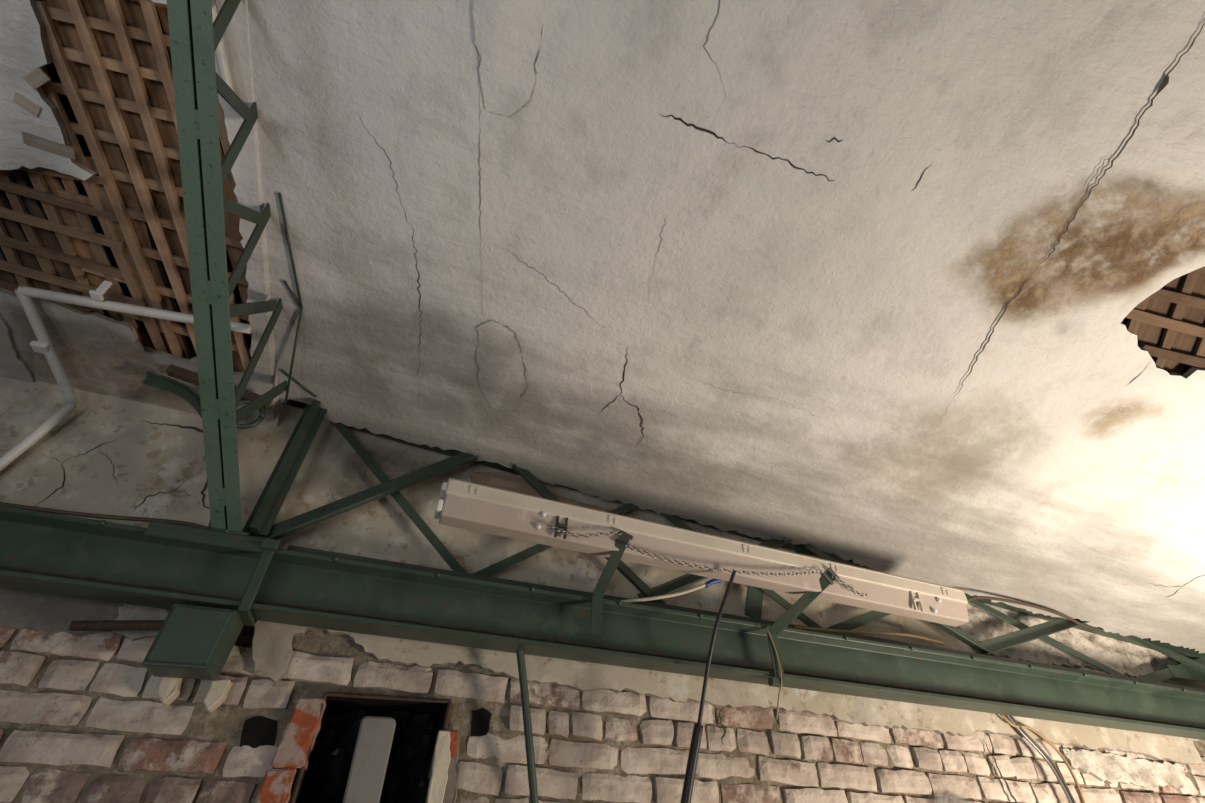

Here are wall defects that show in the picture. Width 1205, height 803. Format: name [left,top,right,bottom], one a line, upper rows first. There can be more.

flaking render [0,0,196,359]
flaking render [217,93,252,372]
crack [476,47,644,446]
crack [658,0,834,181]
crack [934,20,1205,429]
water stain [976,187,1205,316]
flaking render [1121,266,1205,376]
crack [34,421,210,513]
spalling [449,707,492,757]